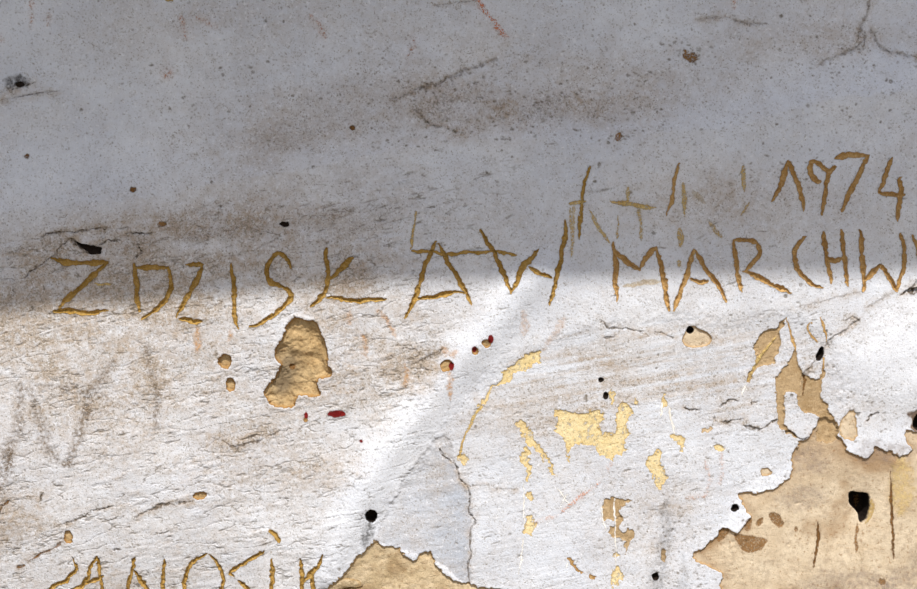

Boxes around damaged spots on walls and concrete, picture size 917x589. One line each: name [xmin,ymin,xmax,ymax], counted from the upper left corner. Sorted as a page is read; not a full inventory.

spalling [263,317,332,408]
spalling [682,326,712,348]
peeling [554,389,638,463]
spalling [693,318,917,589]
spalling [328,540,500,589]